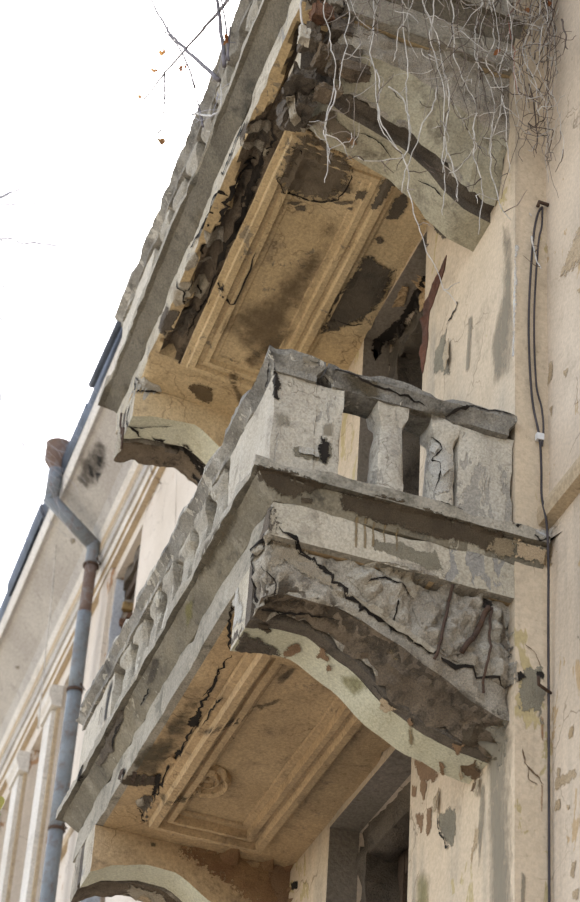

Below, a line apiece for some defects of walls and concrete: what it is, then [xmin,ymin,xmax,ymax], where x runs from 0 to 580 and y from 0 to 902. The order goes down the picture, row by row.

spalling [275,95,408,220]
damp [240,256,317,365]
spalling [321,255,450,376]
damp [493,239,518,377]
damp [79,444,105,486]
crack [119,405,171,449]
damp [188,384,214,404]
peeling [255,464,327,503]
crack [310,360,513,417]
peeling [340,493,504,552]
spalling [249,504,546,731]
crack [154,655,232,801]